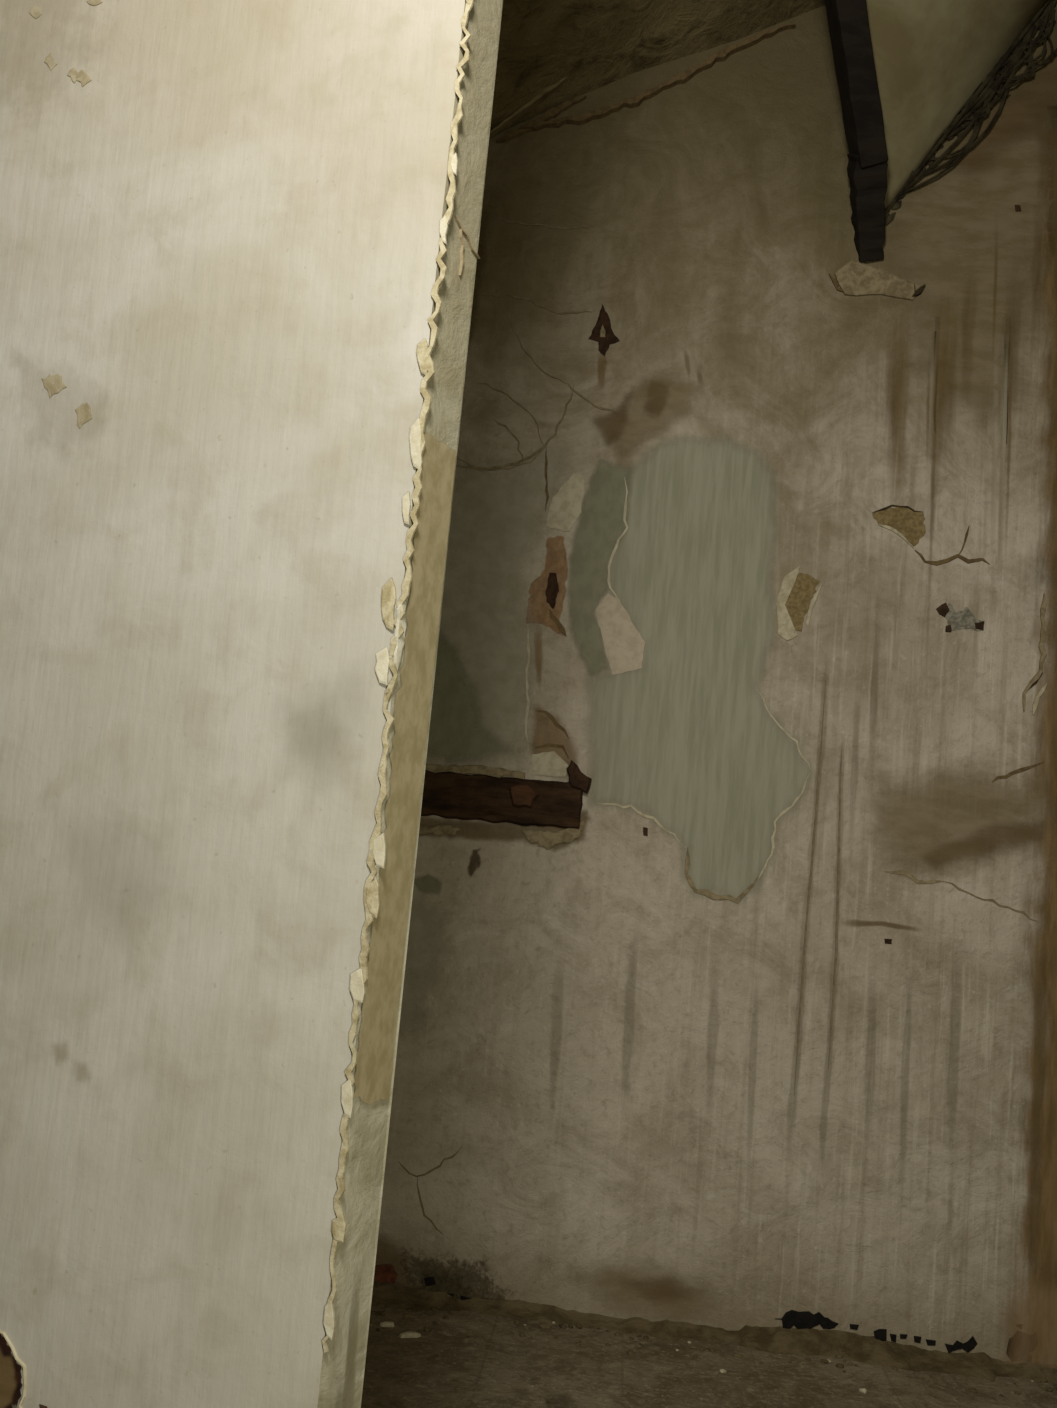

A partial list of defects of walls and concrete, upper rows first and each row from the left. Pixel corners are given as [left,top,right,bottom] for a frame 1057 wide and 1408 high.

flaking render [872,505,926,549]
peeling [322,0,823,1353]
spalling [0,1330,47,1408]
water stain [338,1305,358,1408]